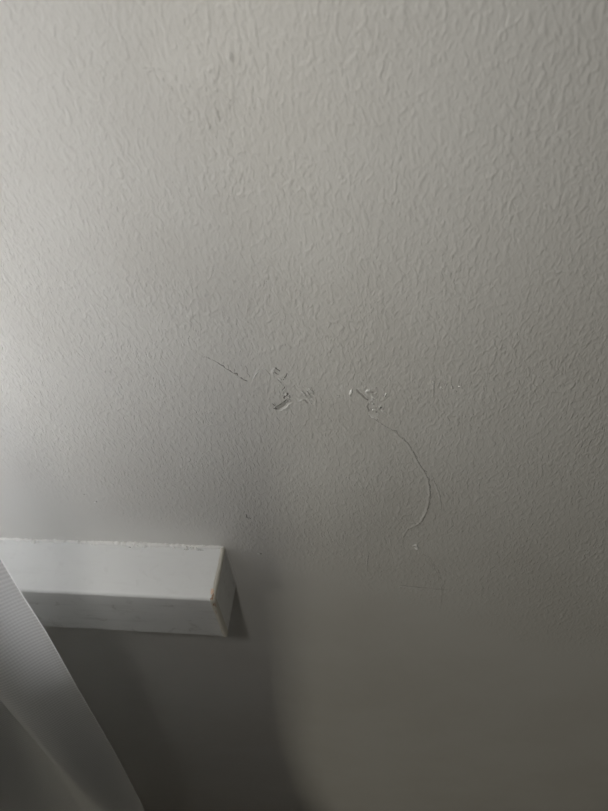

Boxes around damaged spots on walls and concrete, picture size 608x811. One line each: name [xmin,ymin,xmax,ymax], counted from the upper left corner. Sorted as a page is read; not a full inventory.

crack [377,420,442,550]